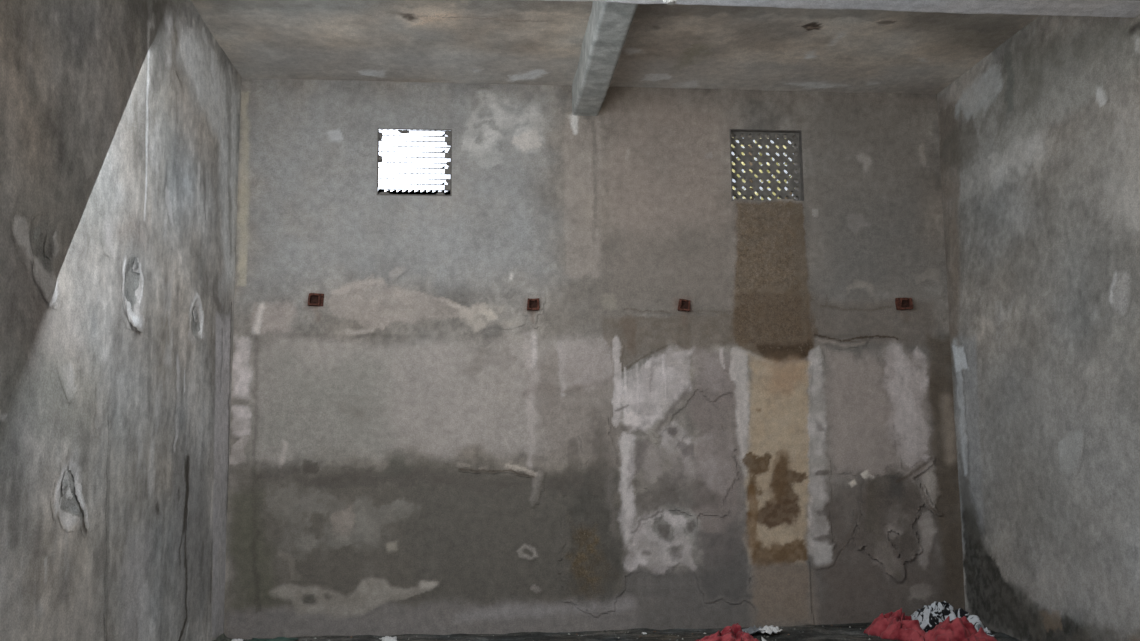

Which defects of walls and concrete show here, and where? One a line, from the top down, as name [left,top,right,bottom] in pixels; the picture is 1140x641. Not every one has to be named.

damp [130,0,608,287]
spalling [10,212,61,313]
damp [57,358,78,403]
spalling [51,442,90,537]
spalling [121,251,148,332]
damp [131,312,153,416]
crack [154,450,191,641]
damp [199,273,751,617]
peeling [819,346,903,489]
damp [632,4,1140,641]